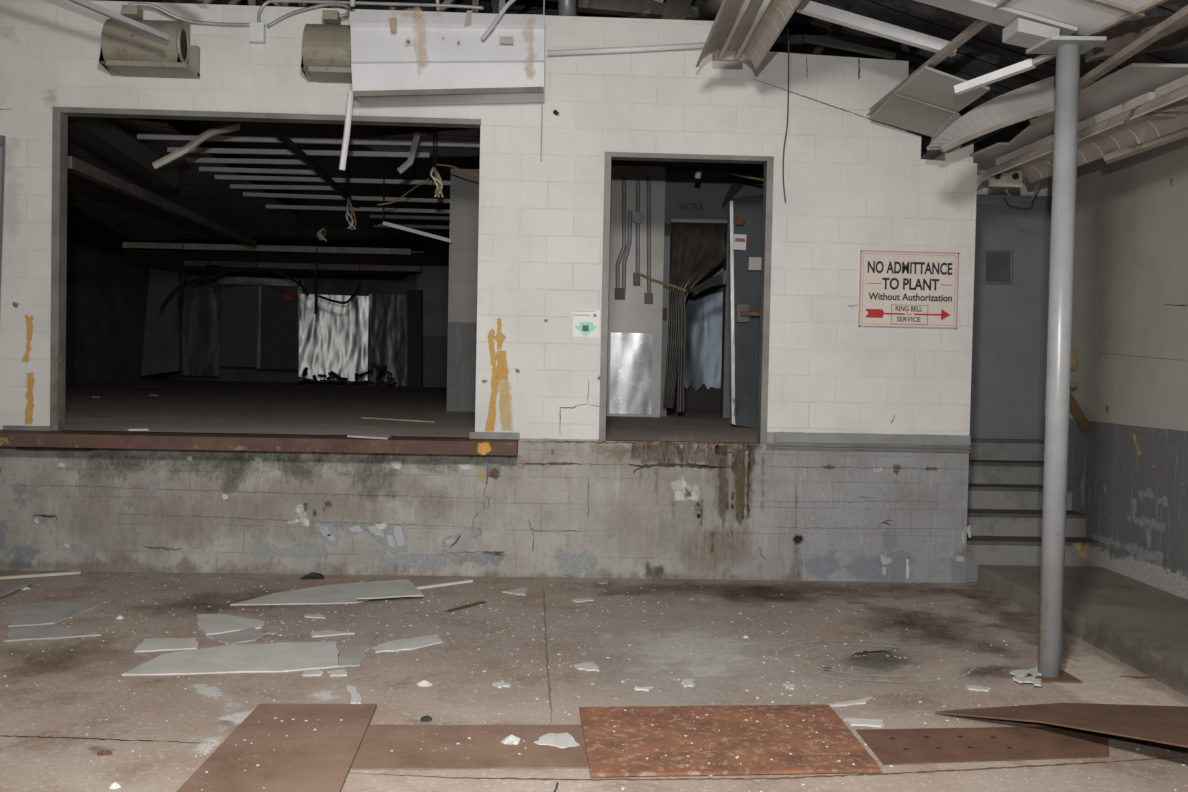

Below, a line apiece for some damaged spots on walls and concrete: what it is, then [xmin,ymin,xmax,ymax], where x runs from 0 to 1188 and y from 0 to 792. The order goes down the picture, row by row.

damp [342,460,401,491]
peeling [671,470,700,501]
peeling [287,504,408,554]
crack [543,588,552,722]
damp [773,612,1003,683]